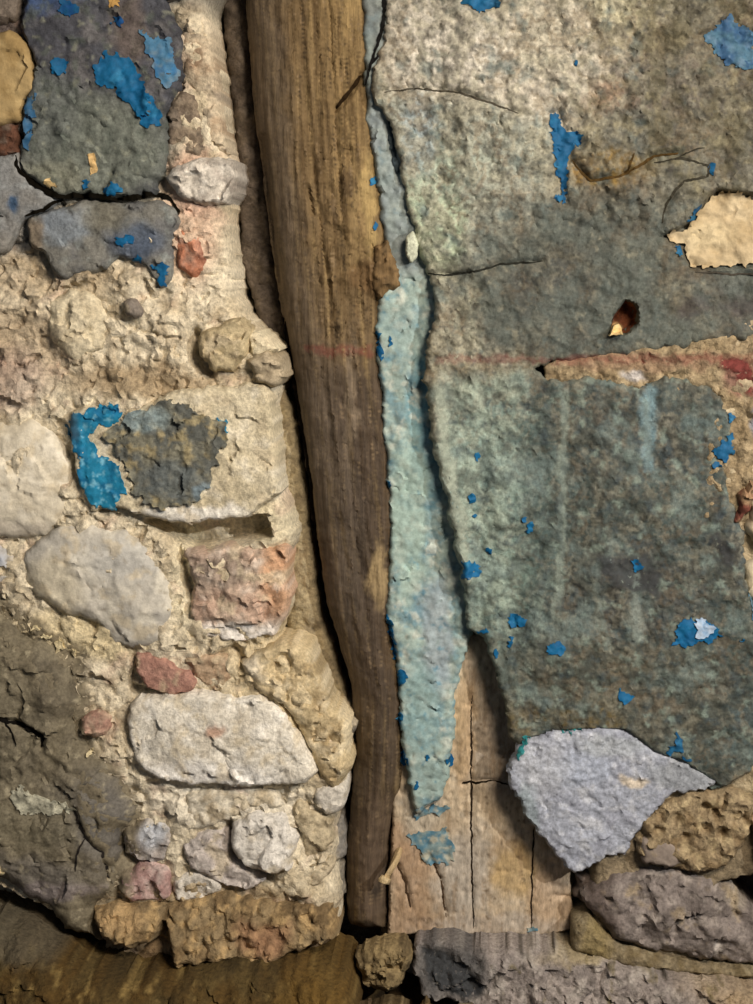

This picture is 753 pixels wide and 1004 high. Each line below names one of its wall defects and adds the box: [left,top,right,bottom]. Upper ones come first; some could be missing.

peeling [460,0,501,13]
peeling [92,50,163,128]
peeling [139,29,181,89]
crack [336,0,519,114]
crack [388,121,400,172]
crack [0,155,181,217]
peeling [115,234,170,287]
spalling [667,191,753,269]
spalling [608,301,637,336]
spalling [543,335,753,511]
peeling [64,398,229,511]
crack [0,717,45,747]